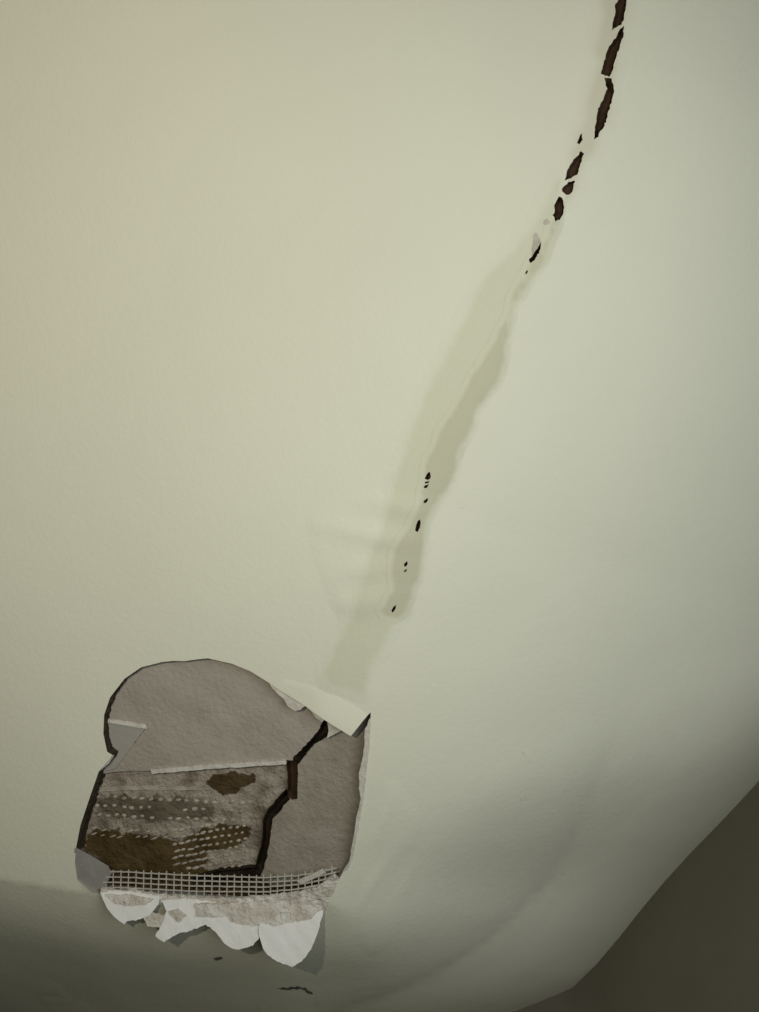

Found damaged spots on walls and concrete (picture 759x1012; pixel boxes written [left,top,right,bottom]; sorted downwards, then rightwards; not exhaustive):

crack [525,0,627,274]
water stain [312,0,639,704]
crack [415,472,431,532]
flaking render [75,662,323,967]
peeling [337,717,371,878]